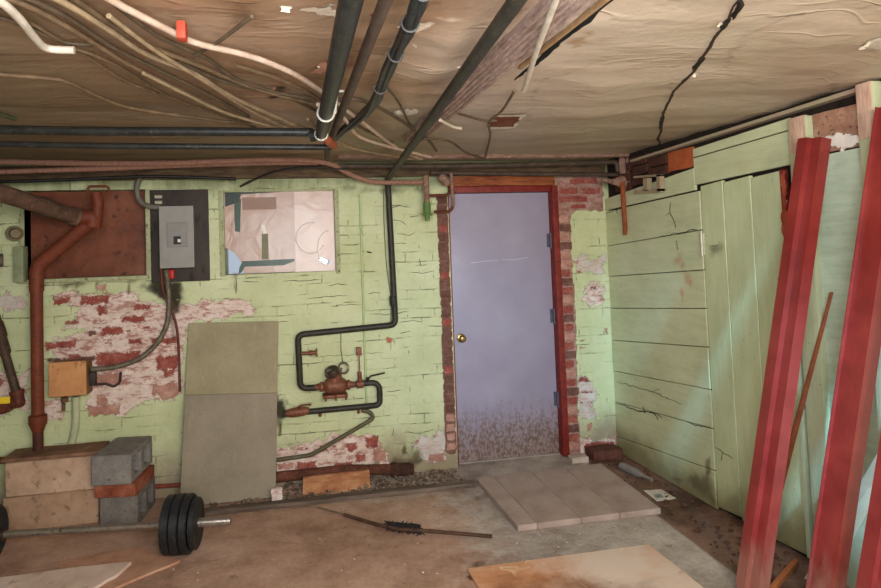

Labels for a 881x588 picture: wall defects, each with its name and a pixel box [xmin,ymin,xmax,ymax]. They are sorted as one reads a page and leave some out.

peeling [858,38,881,50]
crack [656,0,750,146]
flaking render [556,176,617,455]
peeling [44,284,256,421]
peeling [0,368,31,417]
crack [616,383,708,428]
peeling [276,431,389,472]